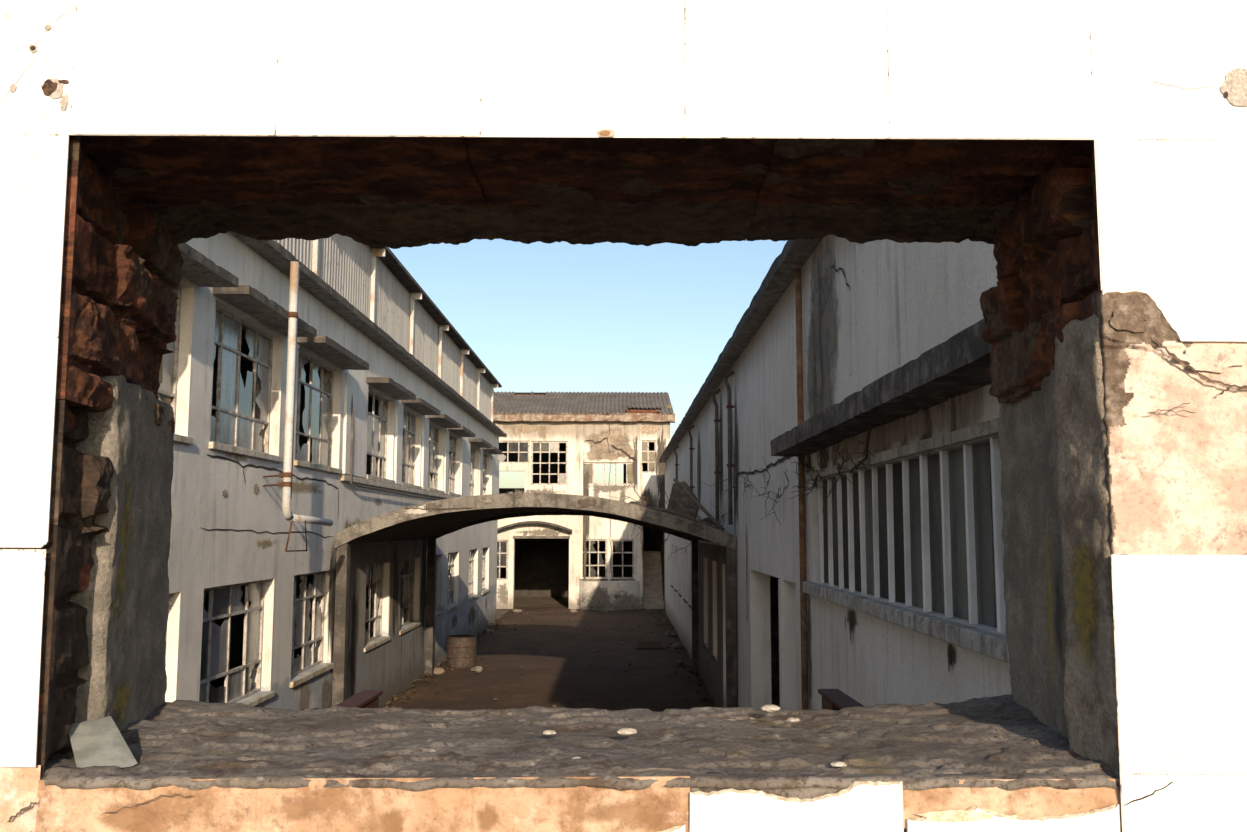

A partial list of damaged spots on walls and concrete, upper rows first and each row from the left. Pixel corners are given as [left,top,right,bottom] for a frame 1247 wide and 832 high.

spalling [41,78,69,111]
spalling [1220,68,1247,107]
peeling [1091,292,1247,558]
crack [1122,710,1188,806]
peeling [0,765,690,832]